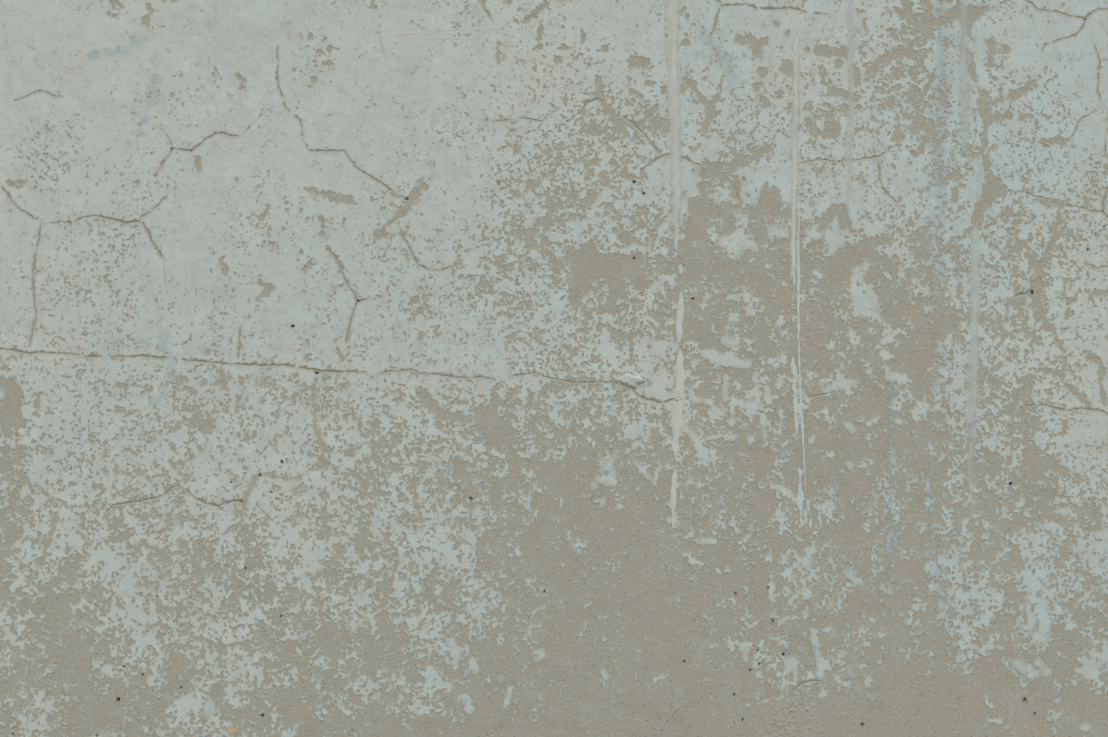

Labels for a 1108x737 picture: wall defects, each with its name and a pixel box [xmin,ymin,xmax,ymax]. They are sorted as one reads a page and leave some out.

peeling [680,73,741,161]
crack [709,0,838,98]
peeling [798,0,989,158]
crack [993,0,1108,158]
crack [0,47,702,559]
water stain [670,470,678,529]
water stain [672,294,686,457]
water stain [770,34,831,531]
peeling [814,203,857,234]
peeling [927,198,1108,685]
crack [1011,186,1108,349]
spalling [739,685,827,737]